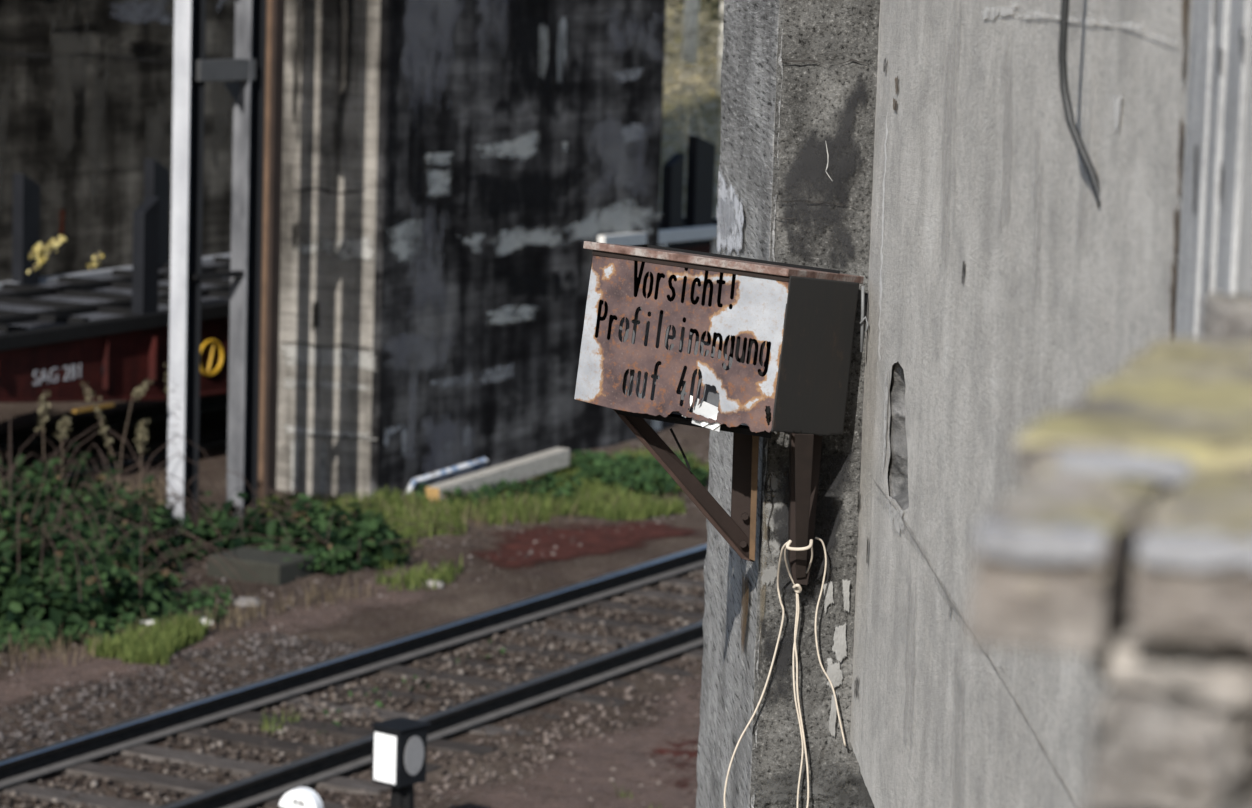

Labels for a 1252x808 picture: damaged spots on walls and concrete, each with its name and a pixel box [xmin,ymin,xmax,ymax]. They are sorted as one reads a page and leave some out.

damp [50,7,109,200]
damp [408,373,473,473]
damp [431,364,513,388]
spalling [882,361,909,533]